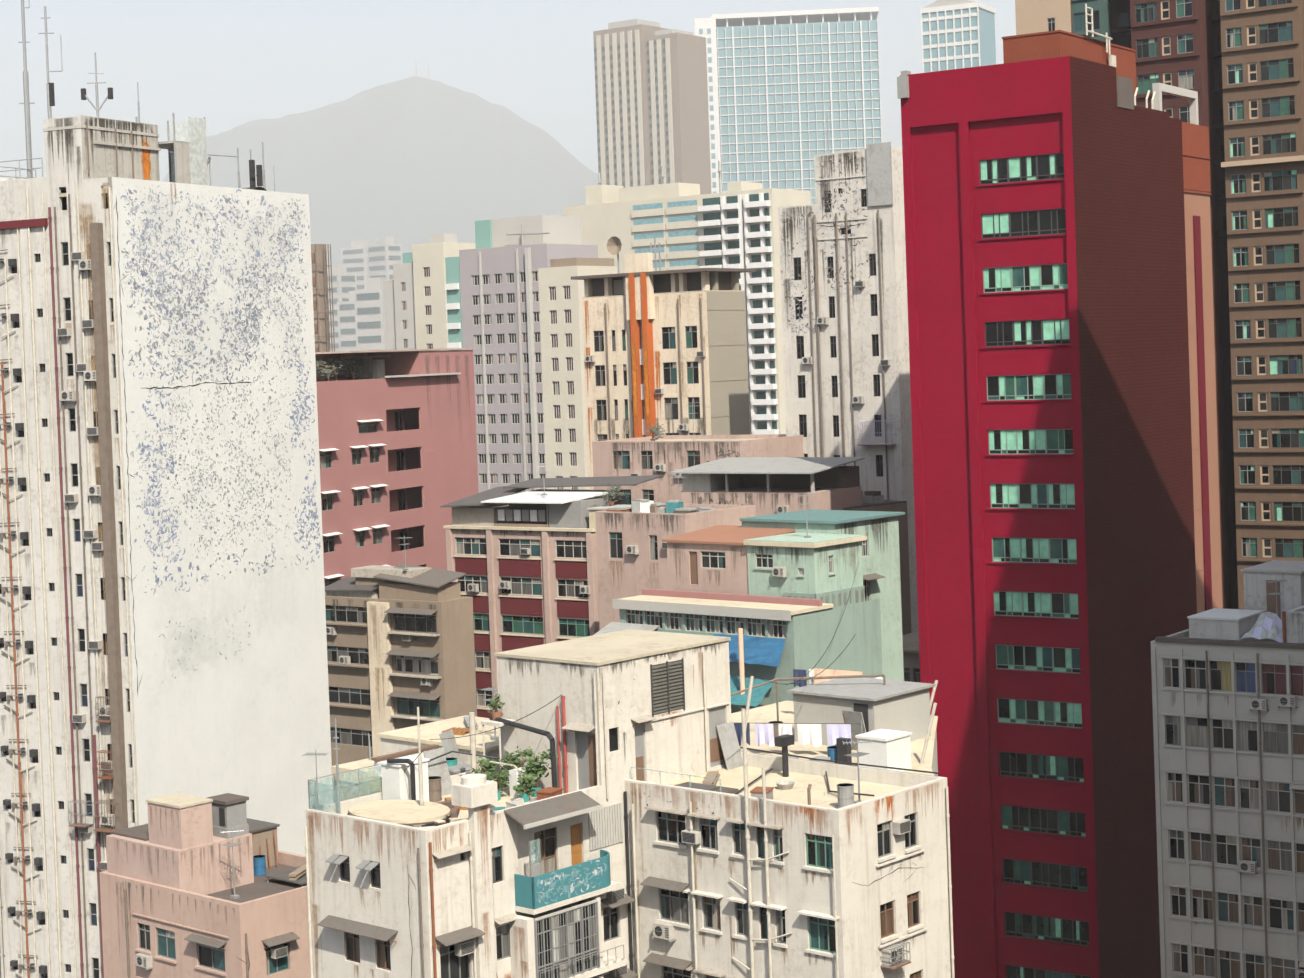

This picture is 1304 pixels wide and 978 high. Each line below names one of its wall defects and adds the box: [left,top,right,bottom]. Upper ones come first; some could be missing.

crack [114,198,251,694]
peeling [121,184,321,595]
damp [783,152,863,308]
peeling [536,860,607,905]